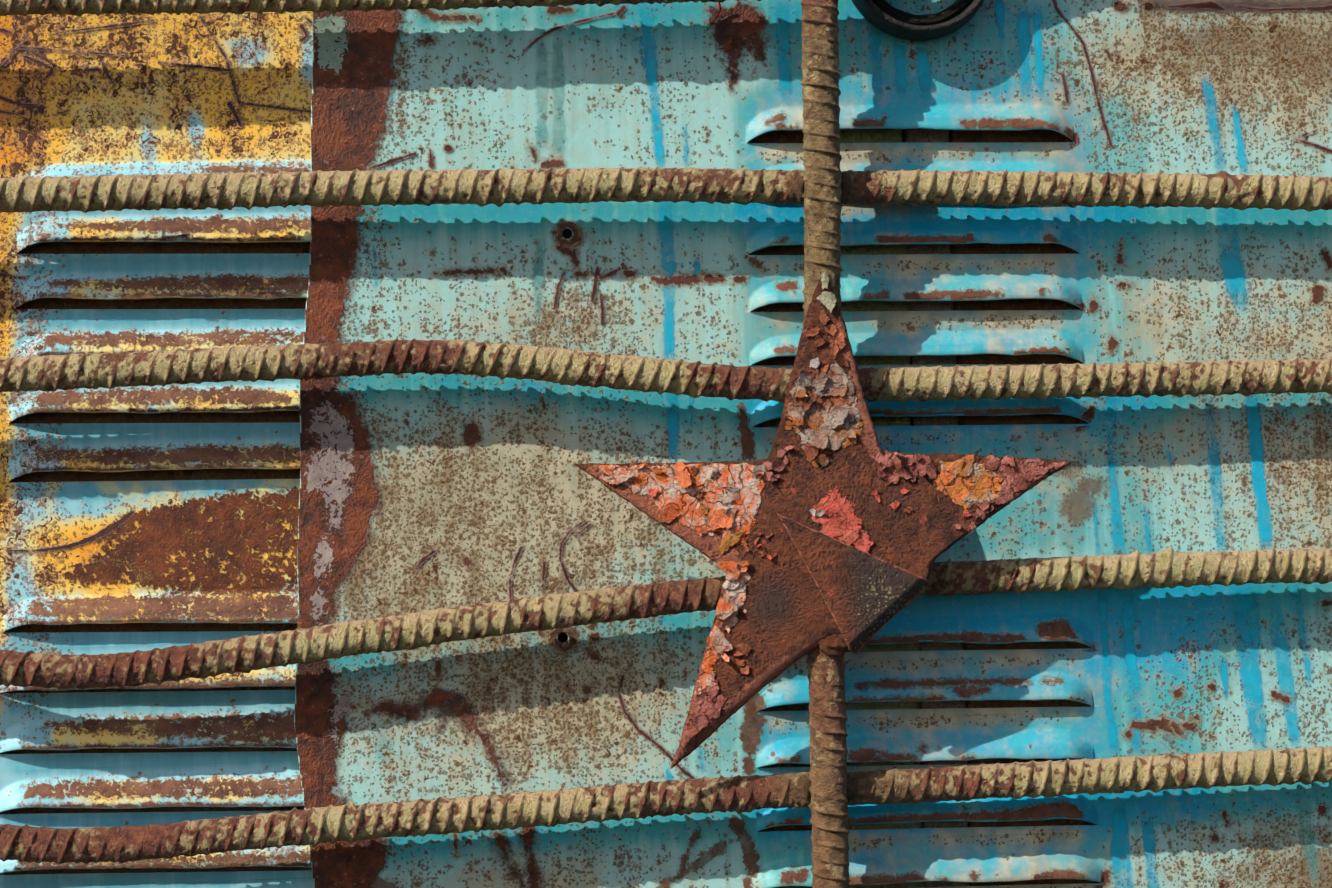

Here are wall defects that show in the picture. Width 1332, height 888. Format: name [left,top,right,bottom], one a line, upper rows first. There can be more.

rust [709,1,769,90]
rust [1112,0,1332,14]
rust [200,9,405,174]
rust [37,205,364,355]
rust [7,376,382,629]
peeling [597,271,874,757]
peeling [871,450,1067,533]
rust [851,676,1063,701]
rust [22,660,355,809]
rust [739,693,767,775]
rust [16,837,399,888]
rust [656,814,761,888]